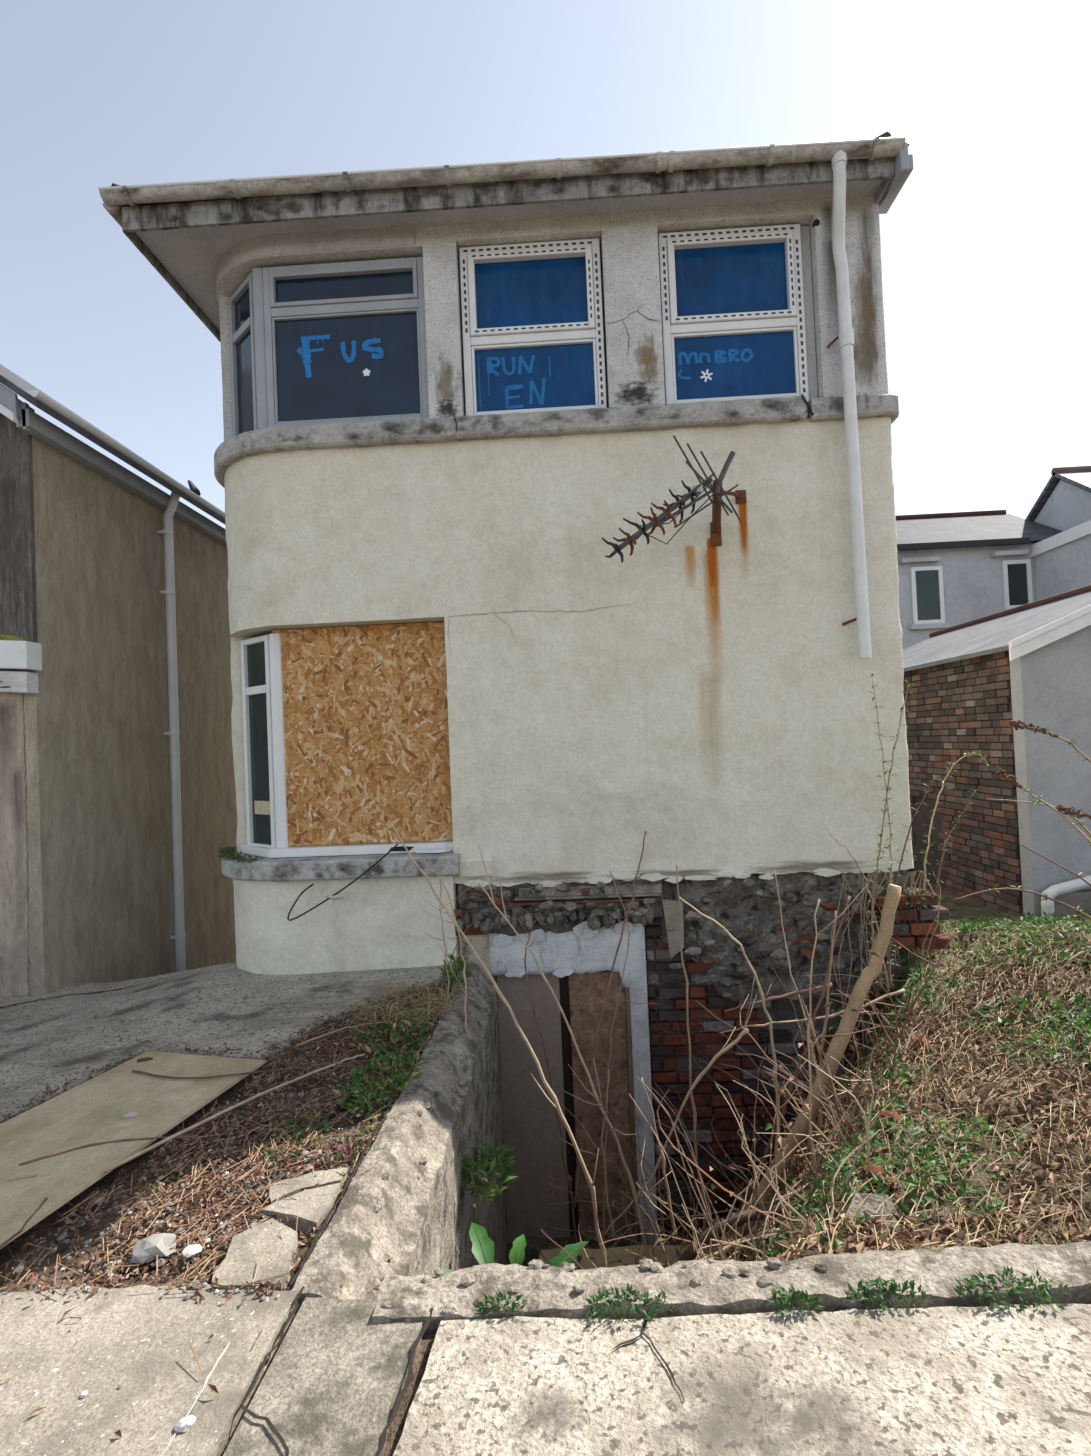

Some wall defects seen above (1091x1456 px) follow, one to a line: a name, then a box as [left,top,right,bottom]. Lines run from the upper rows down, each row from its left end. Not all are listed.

damp [419,364,456,433]
damp [618,339,656,413]
rust [687,538,717,618]
spalling [417,867,918,1126]
spalling [373,1171,390,1213]
spalling [372,1248,395,1309]